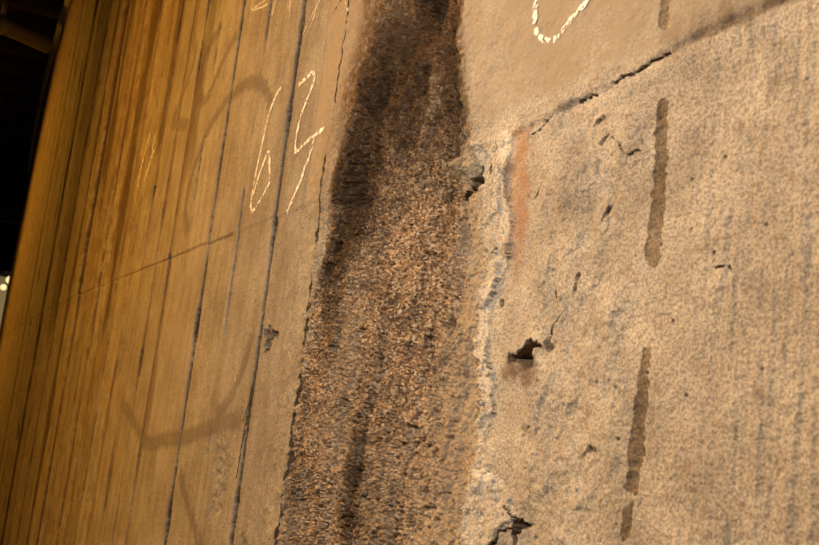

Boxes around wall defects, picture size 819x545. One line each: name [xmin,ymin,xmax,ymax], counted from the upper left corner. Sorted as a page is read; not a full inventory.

crack [580,52,671,103]
water stain [321,0,466,288]
spalling [277,0,534,545]
hole [507,337,555,368]
water stain [343,462,365,535]